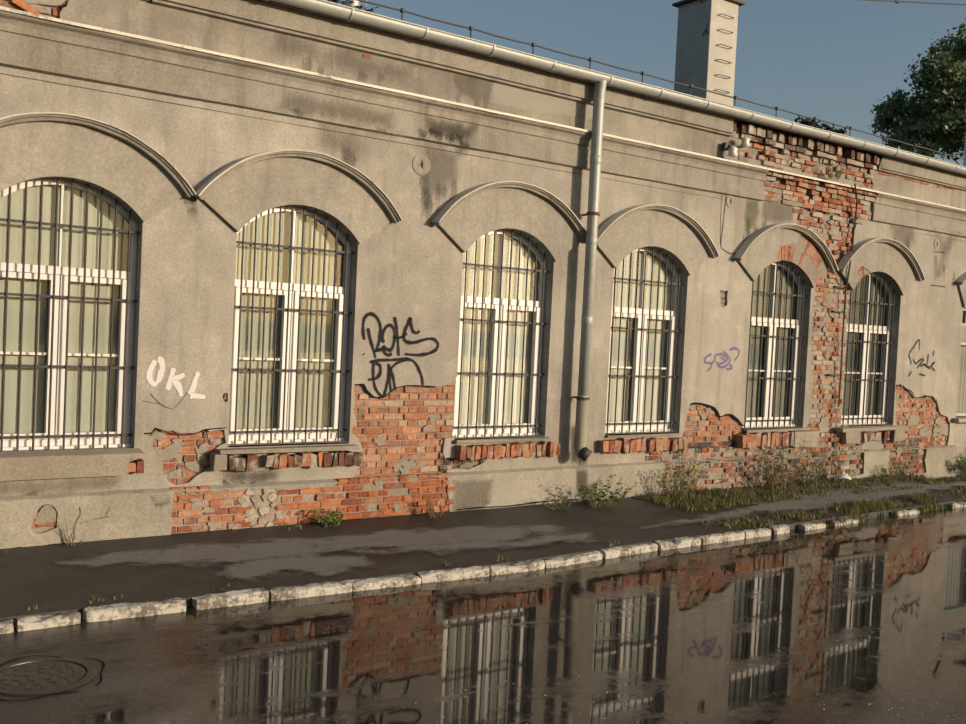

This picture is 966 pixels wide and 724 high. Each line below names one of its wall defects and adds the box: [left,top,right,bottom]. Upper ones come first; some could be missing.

flaking render [0,0,68,18]
flaking render [597,121,955,491]
flaking render [129,458,144,474]
flaking render [147,381,561,534]